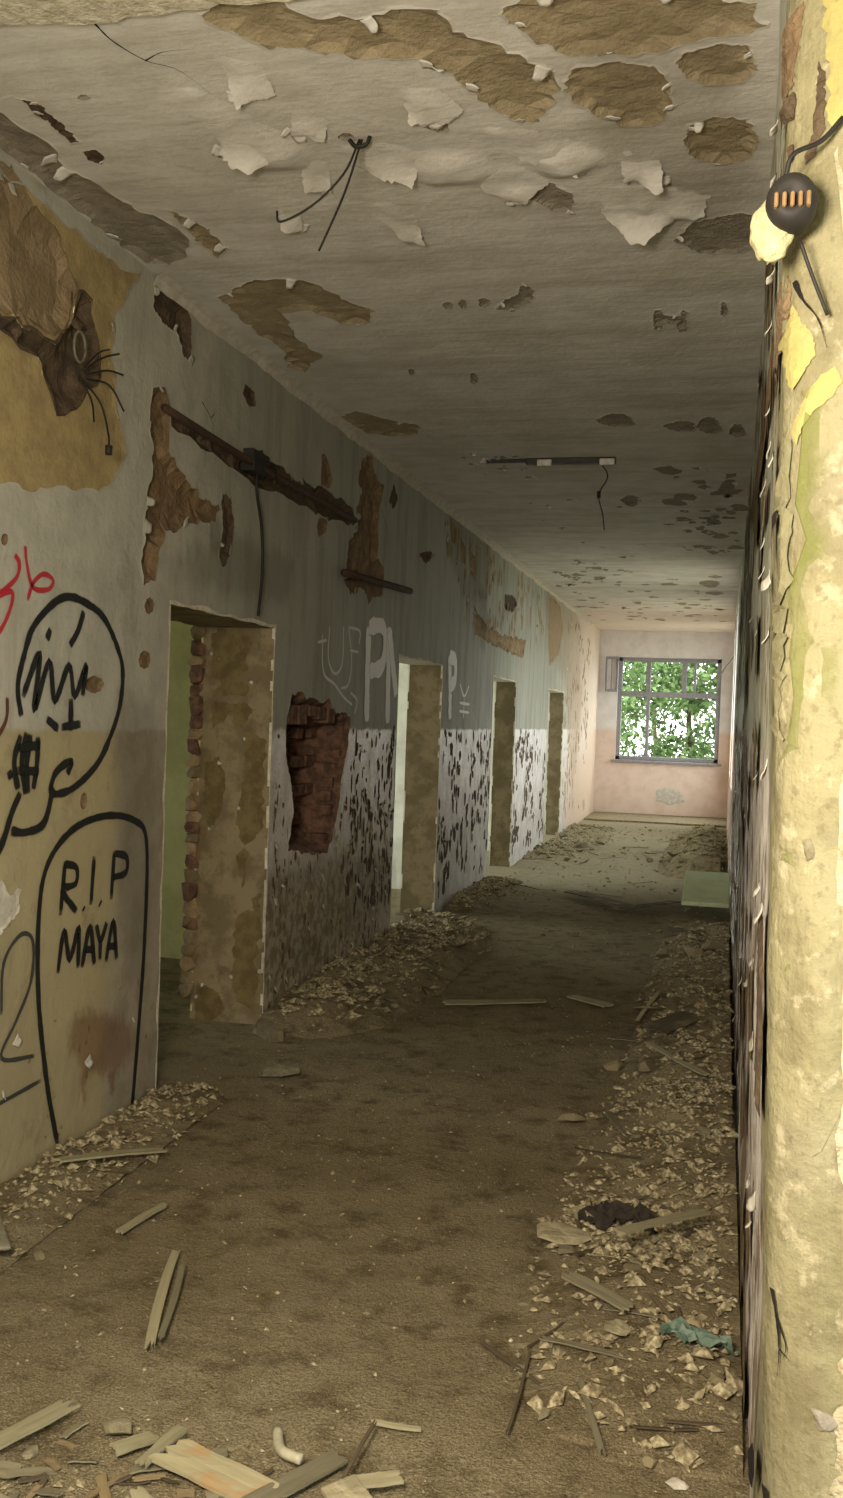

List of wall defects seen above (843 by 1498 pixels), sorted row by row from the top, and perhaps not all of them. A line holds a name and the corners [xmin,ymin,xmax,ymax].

spalling [154,0,843,255]
peeling [86,673,104,694]
peeling [0,878,23,938]
spalling [132,262,843,1498]
peeling [12,1029,48,1064]
peeling [78,1026,93,1078]